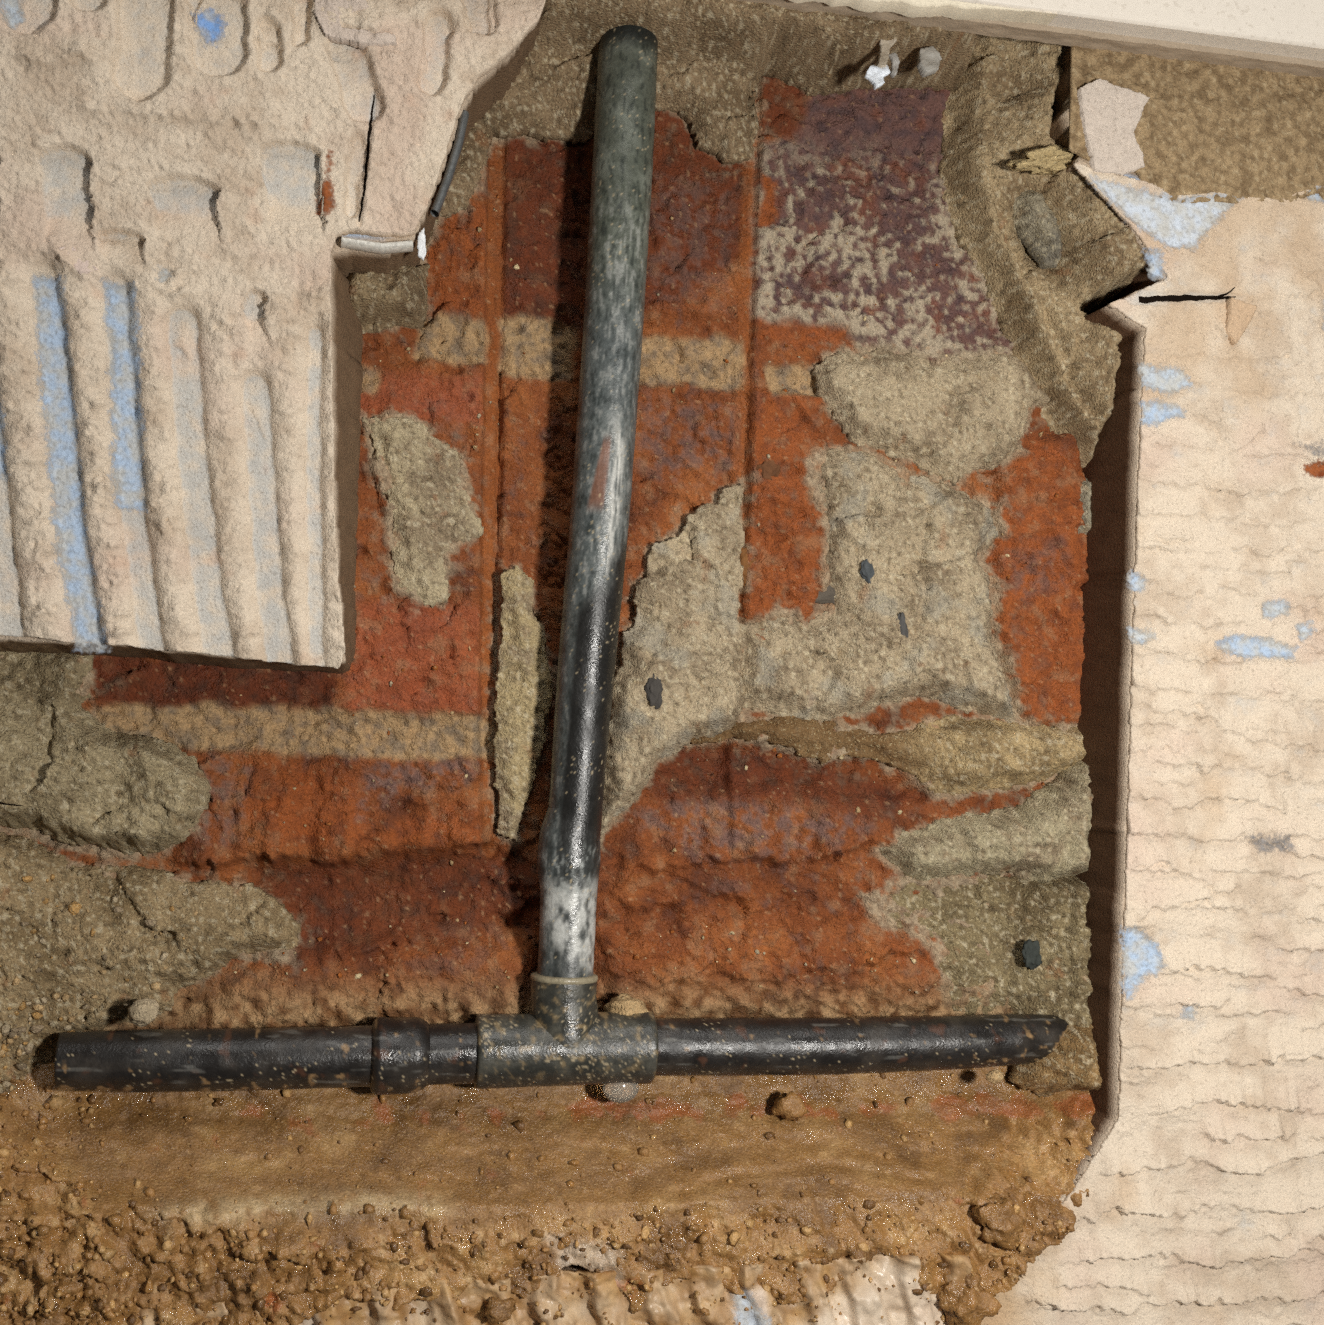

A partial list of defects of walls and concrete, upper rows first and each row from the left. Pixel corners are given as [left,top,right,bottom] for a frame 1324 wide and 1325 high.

peeling [191,8,225,43]
peeling [314,0,397,50]
crack [359,95,375,222]
crack [1139,287,1235,304]
spalling [347,0,1324,1097]
spalling [0,247,301,1094]
peeling [733,1290,771,1325]